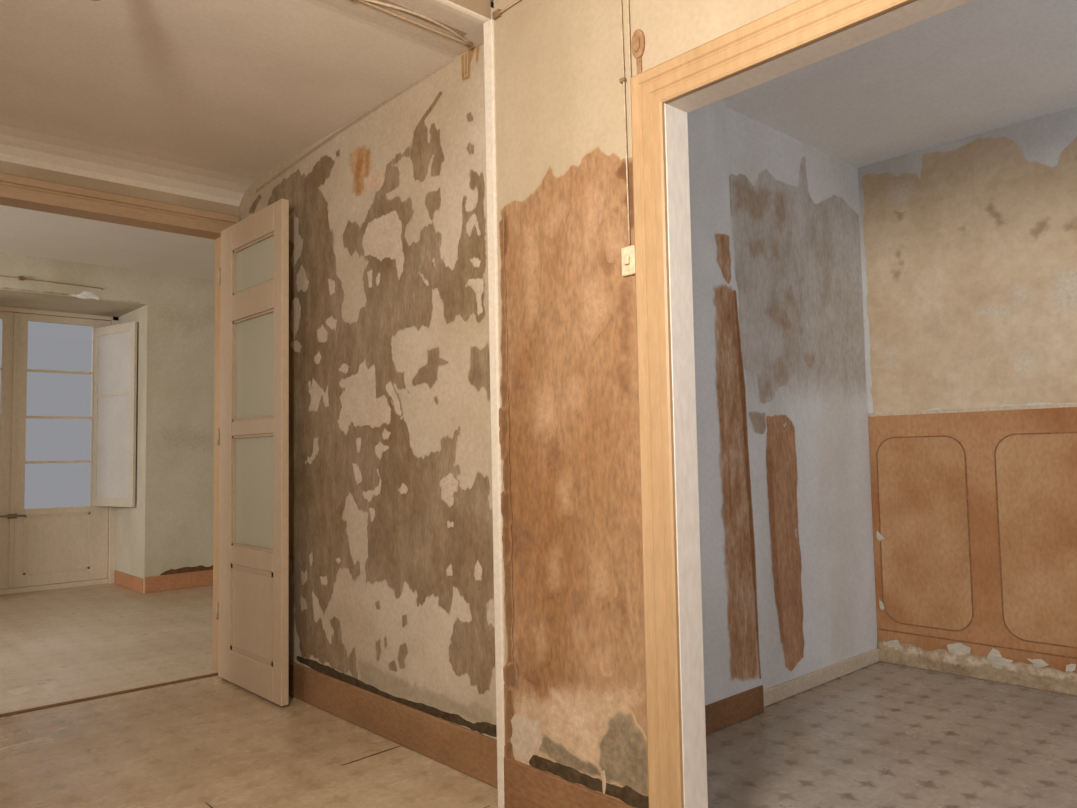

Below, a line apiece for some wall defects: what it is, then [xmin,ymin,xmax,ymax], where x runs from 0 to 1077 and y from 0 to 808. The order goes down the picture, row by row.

peeling [249,117,648,808]
peeling [711,135,1077,684]